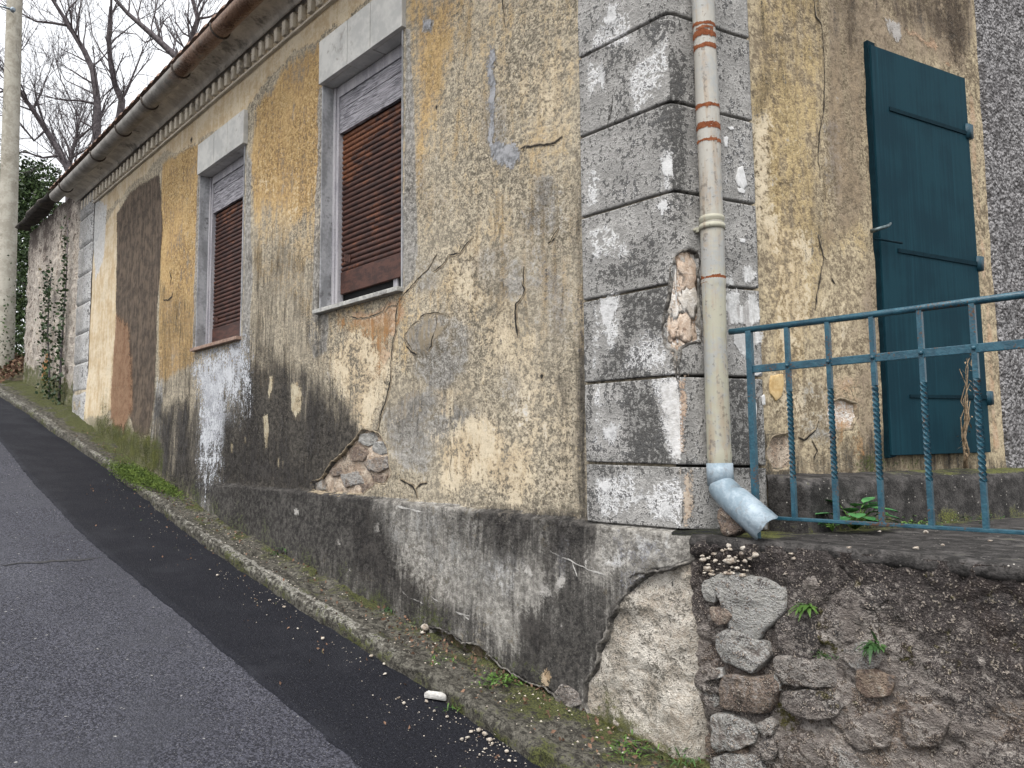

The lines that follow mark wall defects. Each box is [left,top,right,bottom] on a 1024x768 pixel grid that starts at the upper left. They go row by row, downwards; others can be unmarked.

crack [814,0,826,171]
crack [815,236,835,309]
crack [349,238,473,431]
spalling [659,248,702,460]
spalling [310,428,392,497]
spalling [660,469,694,527]
water stain [349,491,571,644]
crack [552,552,655,579]
water stain [510,599,552,673]